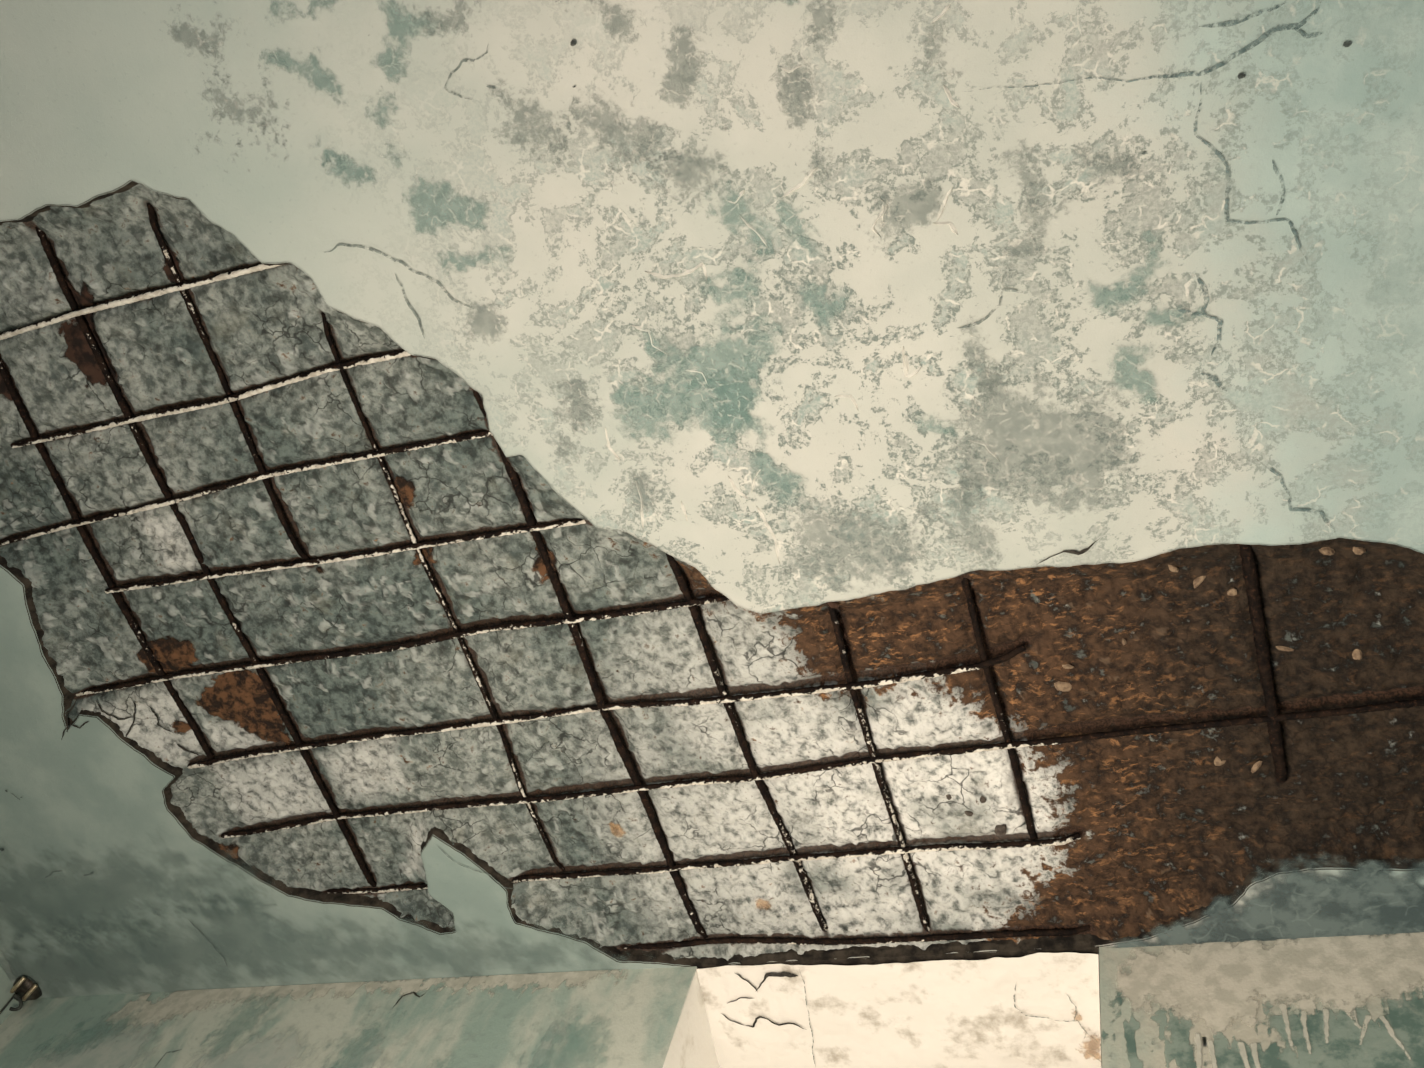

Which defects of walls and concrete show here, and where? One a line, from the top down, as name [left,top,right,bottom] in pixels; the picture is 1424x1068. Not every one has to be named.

crack [951,3,1322,264]
peeling [776,167,817,247]
corrosion [58,275,118,389]
crack [328,243,472,339]
crack [1178,278,1227,391]
crack [1258,460,1335,530]
spalling [0,180,1424,967]
corrosion [136,636,199,674]
corrosion [172,720,191,735]
corrosion [195,670,293,747]
leakage [1102,857,1424,1068]
crack [721,969,815,1063]